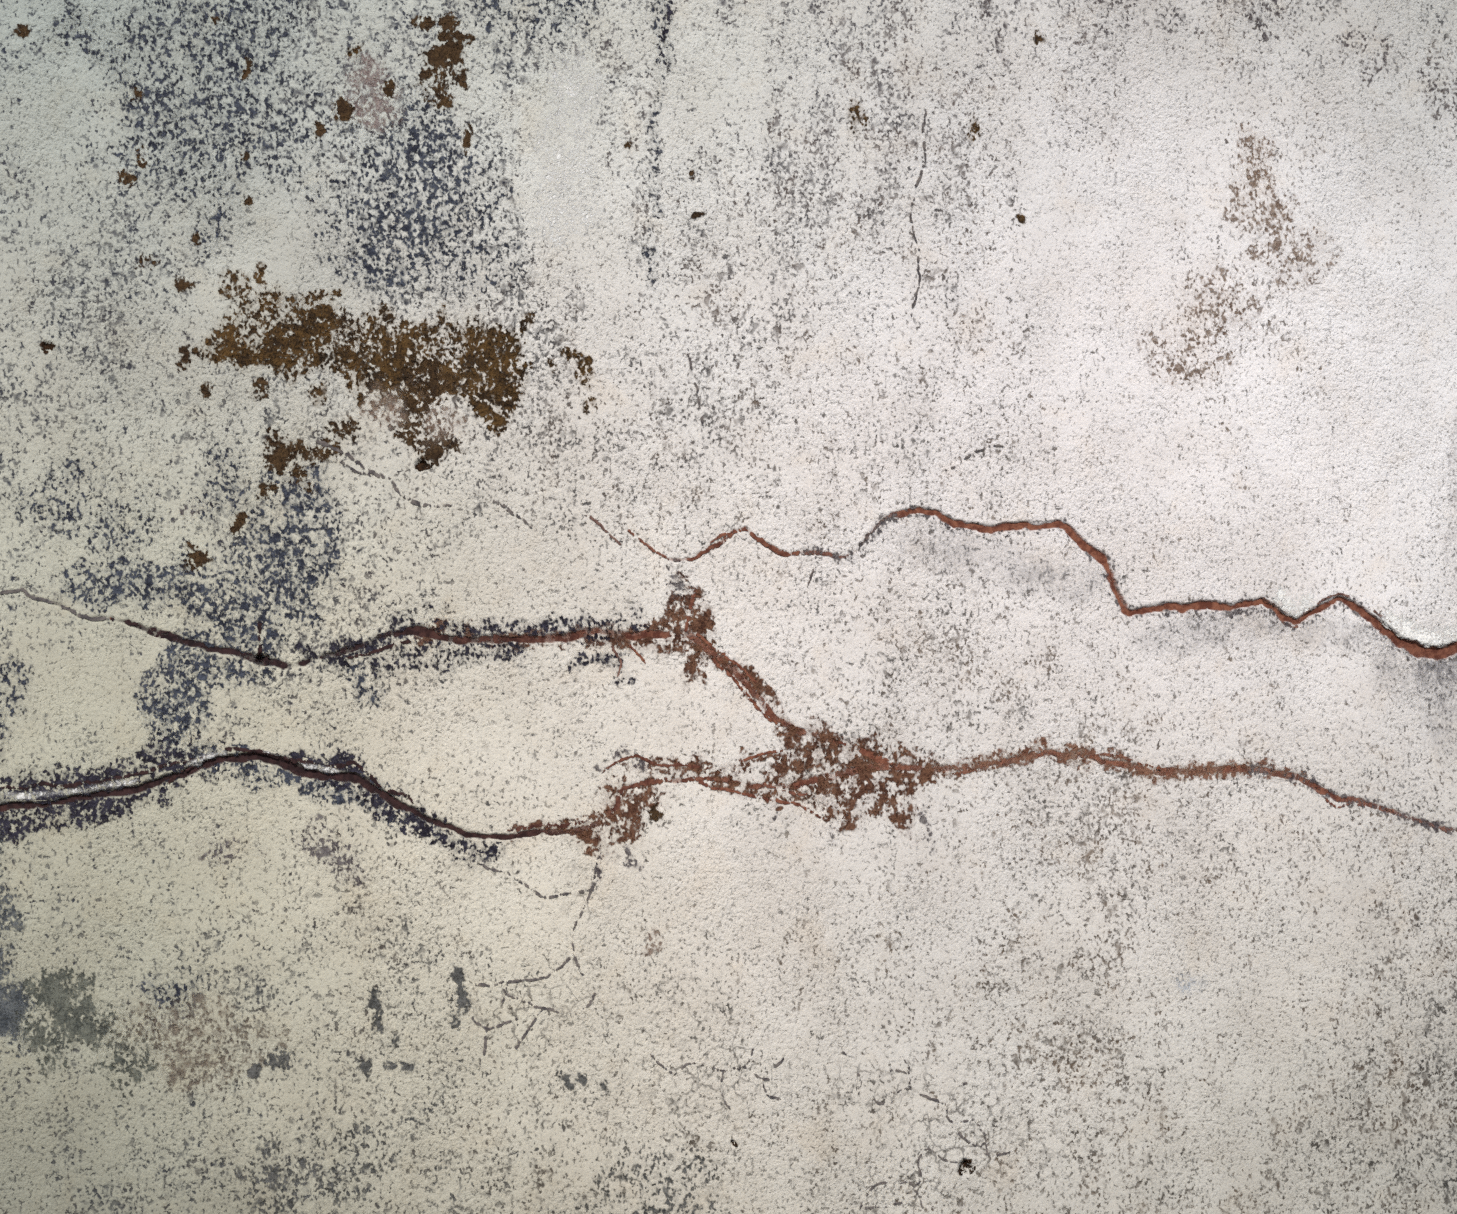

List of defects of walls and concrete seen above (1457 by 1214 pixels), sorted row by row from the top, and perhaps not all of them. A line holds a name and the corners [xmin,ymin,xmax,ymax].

rust [411,12,475,110]
water stain [52,0,526,302]
rust [313,96,355,139]
water stain [440,0,609,247]
water stain [642,0,675,289]
rust [174,262,598,499]
rust [184,541,213,572]
rust [230,512,248,535]
crack [316,440,452,508]
crack [493,500,532,528]
crack [945,444,1003,470]
crack [0,505,1457,1067]